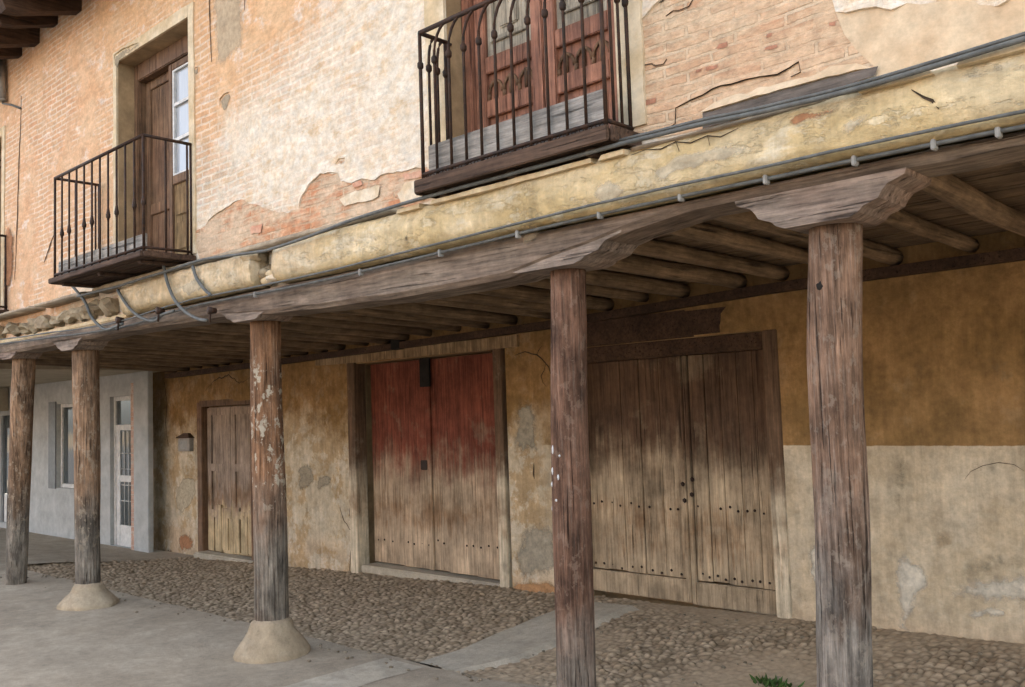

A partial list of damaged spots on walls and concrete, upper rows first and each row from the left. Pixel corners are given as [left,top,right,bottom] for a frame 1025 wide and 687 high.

flaking render [633,0,1025,139]
flaking render [196,155,429,259]